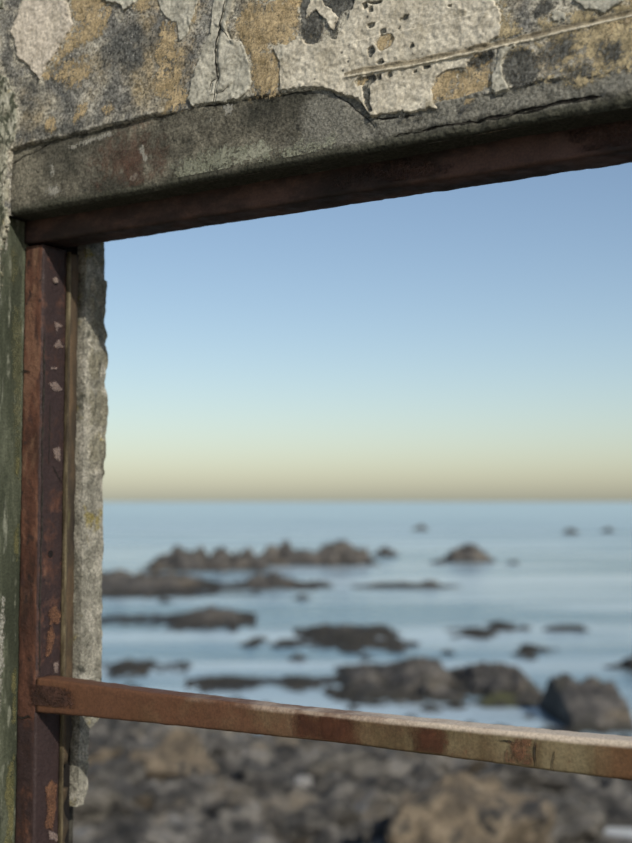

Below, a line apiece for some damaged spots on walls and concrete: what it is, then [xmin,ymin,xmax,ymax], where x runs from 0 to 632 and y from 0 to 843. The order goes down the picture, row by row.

flaking render [10,0,74,80]
flaking render [158,0,198,42]
crack [205,1,229,106]
flaking render [187,0,252,107]
flaking render [273,0,589,121]
flaking render [573,0,625,14]
corrosion [46,604,61,656]
leakage [0,596,16,724]
corrosion [293,714,354,743]
corrosion [414,728,446,754]
corrosion [505,738,536,765]
corrosion [45,780,57,830]